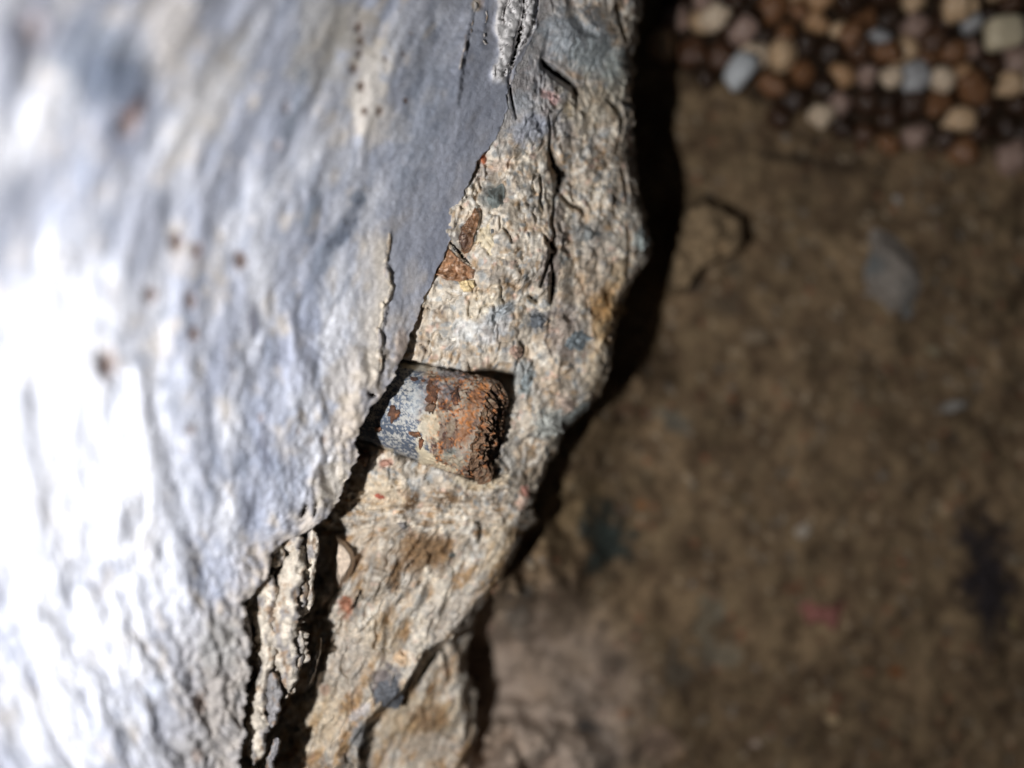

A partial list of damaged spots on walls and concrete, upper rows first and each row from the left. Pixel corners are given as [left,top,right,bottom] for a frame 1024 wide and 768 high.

crack [499,123,584,302]
spalling [238,0,652,768]
crack [301,504,317,518]
crack [343,564,363,608]